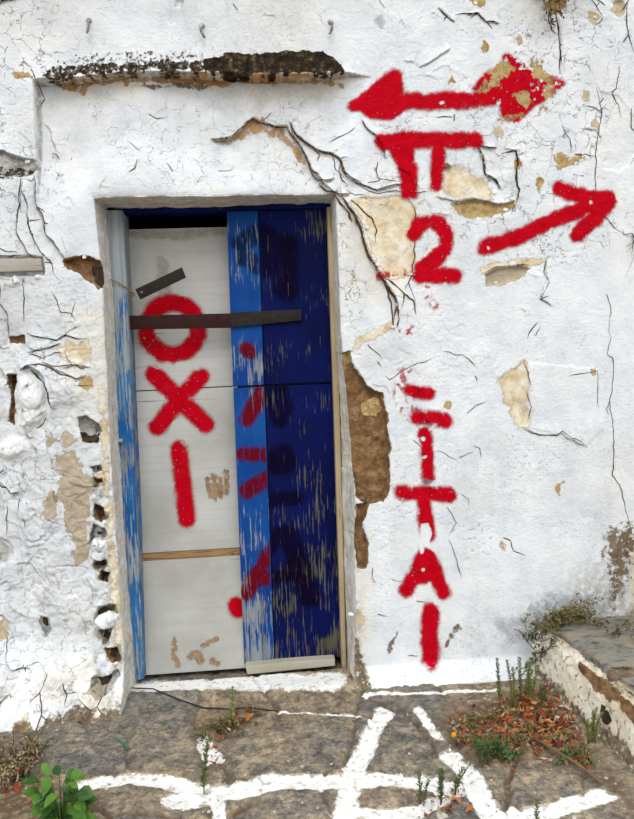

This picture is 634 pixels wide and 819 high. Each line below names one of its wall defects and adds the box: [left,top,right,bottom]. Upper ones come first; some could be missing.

crack [592,0,634,51]
flaking render [0,149,40,180]
crack [212,113,426,330]
flaking render [442,163,516,220]
flaking render [474,51,555,137]
crack [562,66,634,188]
crack [0,175,89,439]
flaking render [62,254,104,290]
flaking render [6,373,17,425]
flaking render [342,321,396,569]
flaking render [41,415,108,580]
leakage [609,527,634,599]